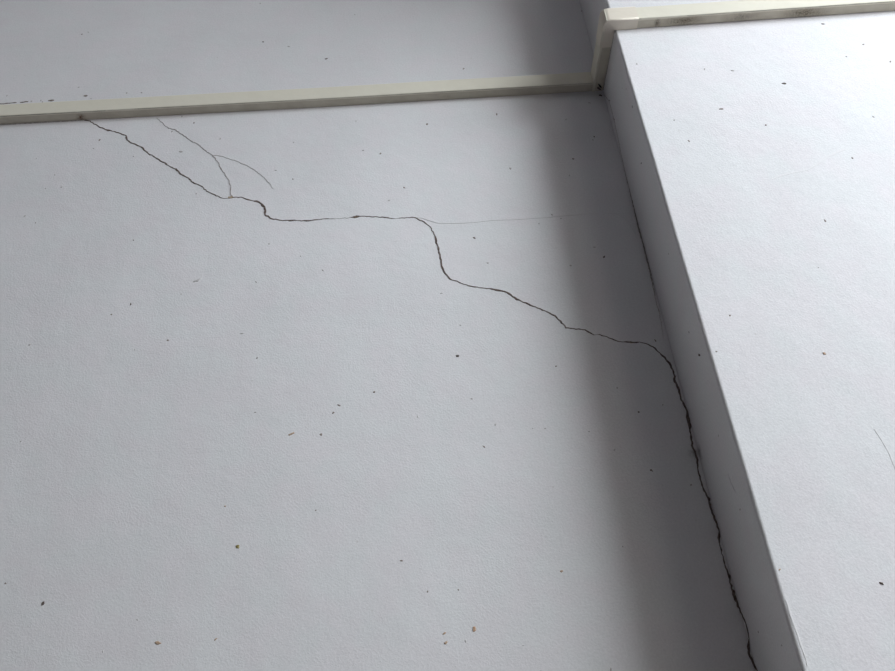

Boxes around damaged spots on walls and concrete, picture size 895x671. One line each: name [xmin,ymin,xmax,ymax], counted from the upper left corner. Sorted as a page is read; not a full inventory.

crack [0,118,758,671]
crack [514,35,663,333]